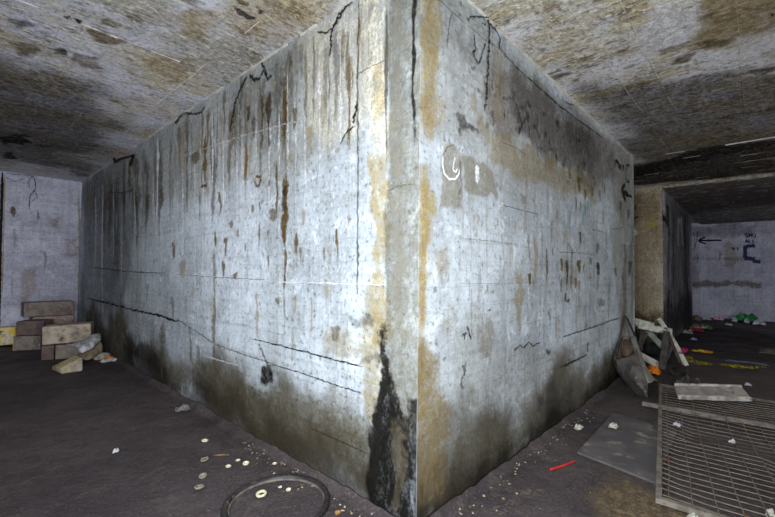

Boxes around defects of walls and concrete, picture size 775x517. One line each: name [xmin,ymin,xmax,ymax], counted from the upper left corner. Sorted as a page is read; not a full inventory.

crack [6,173,38,209]
corrosion [178,75,272,210]
crack [230,62,272,130]
corrosion [244,144,301,287]
corrosion [283,90,296,138]
crack [317,2,385,293]
crack [439,0,605,140]
damp [604,67,775,185]
corrosion [212,231,237,368]
damp [259,344,273,384]
damp [195,364,343,459]
damp [363,325,620,517]